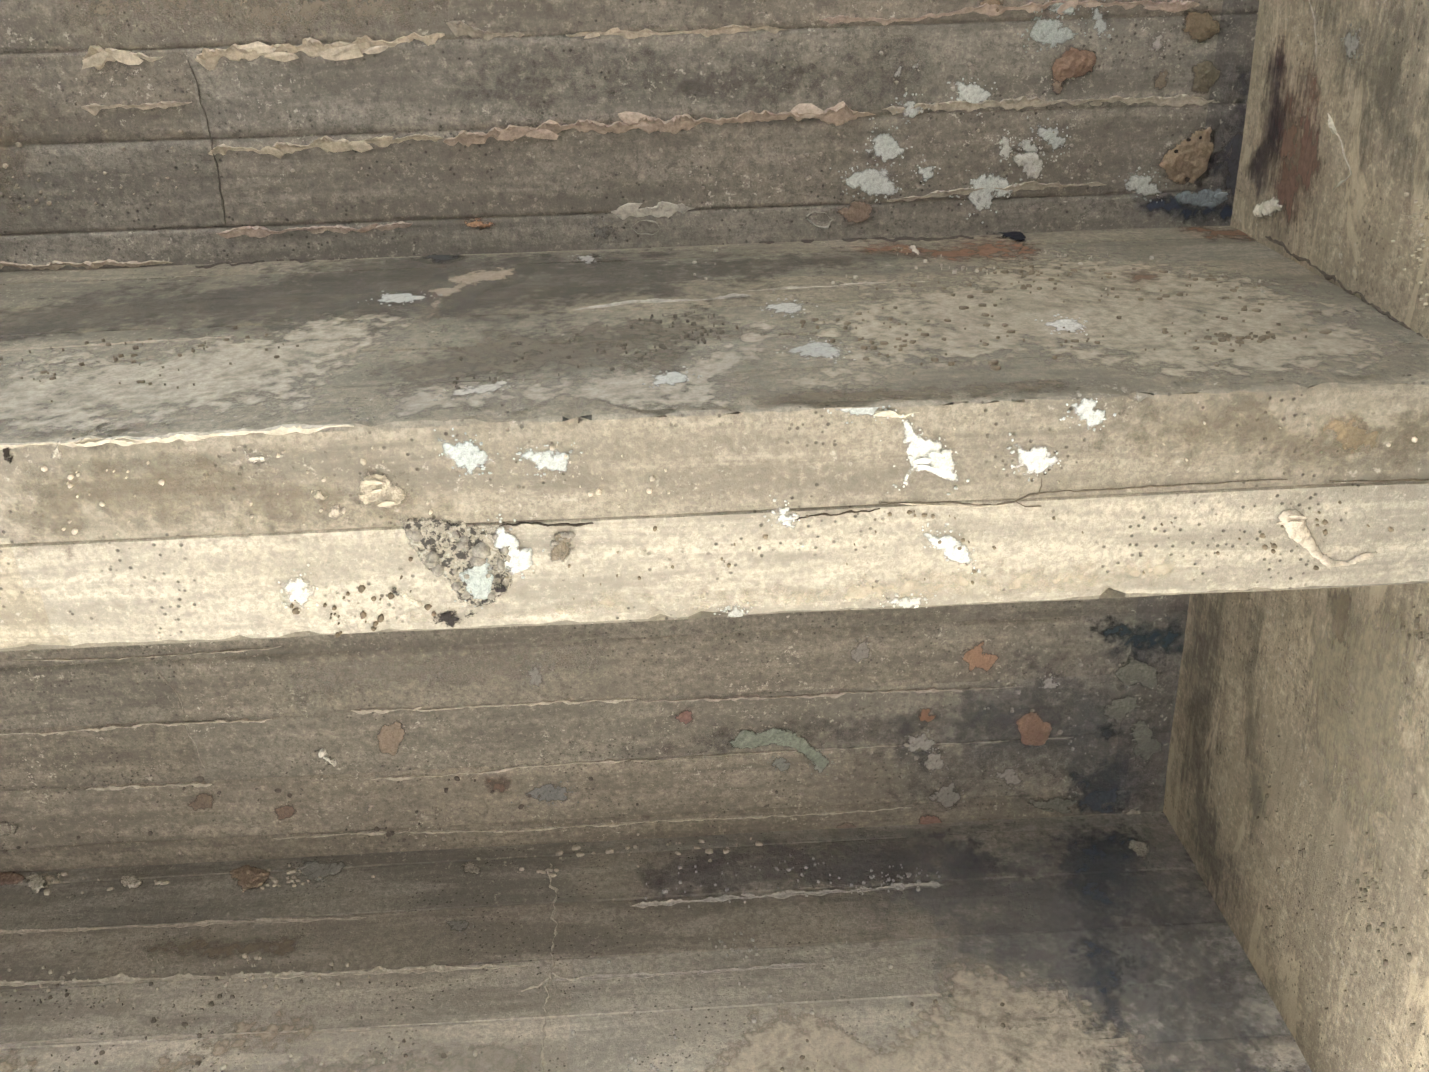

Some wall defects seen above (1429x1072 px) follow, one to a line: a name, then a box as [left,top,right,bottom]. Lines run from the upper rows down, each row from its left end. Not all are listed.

peeling [82,49,143,69]
peeling [236,41,299,62]
peeling [318,43,388,61]
peeling [325,136,393,153]
peeling [496,126,559,141]
corrosion [839,236,1041,262]
peeling [913,452,944,471]
spalling [313,491,342,519]
spalling [323,472,516,638]
damp [1091,616,1184,760]
damp [730,727,829,770]
damp [706,760,1267,1072]